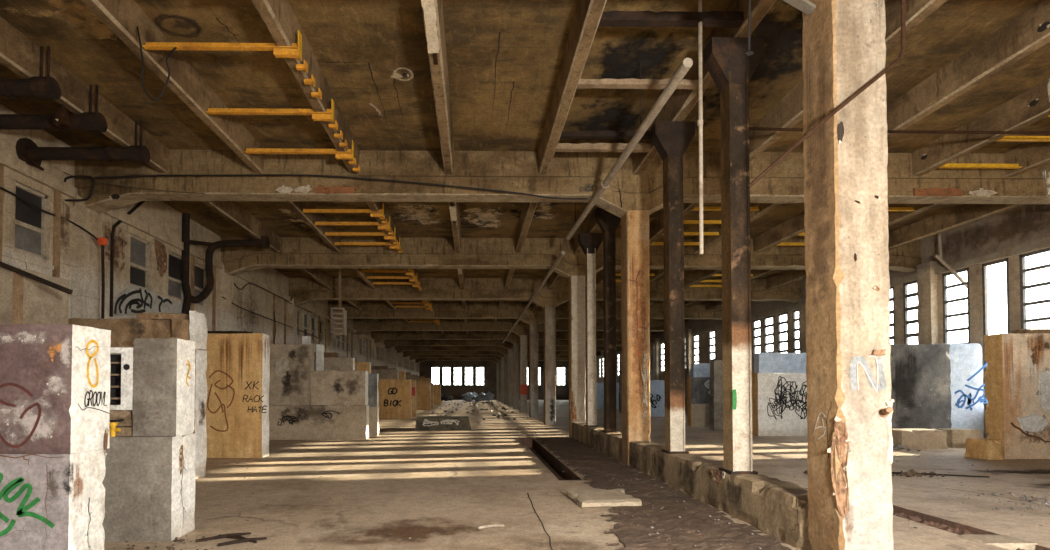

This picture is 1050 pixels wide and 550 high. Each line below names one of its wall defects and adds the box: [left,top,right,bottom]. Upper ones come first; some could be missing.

leakage [604,40,676,79]
peeling [2,332,44,342]
peeling [60,339,71,366]
peeling [46,377,65,395]
leakage [895,354,914,406]
peeling [1,404,52,438]
spalling [827,416,853,517]